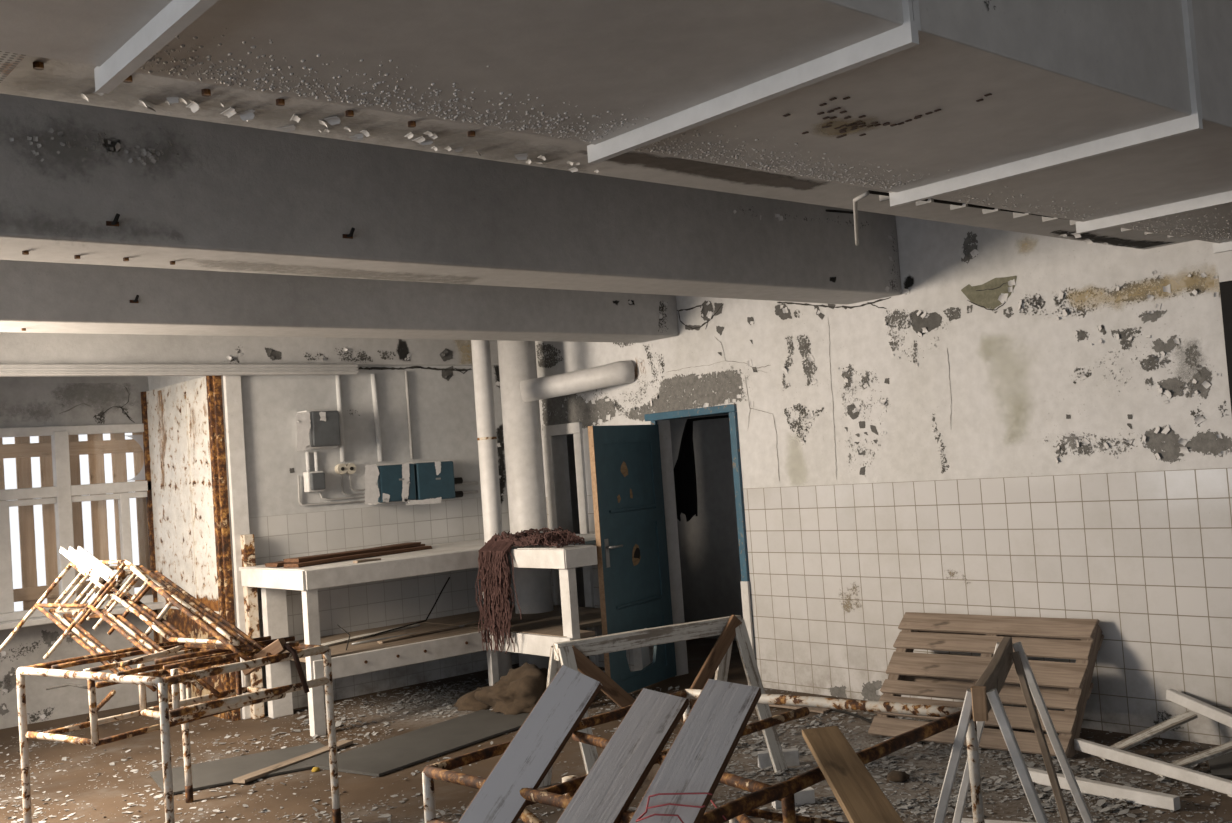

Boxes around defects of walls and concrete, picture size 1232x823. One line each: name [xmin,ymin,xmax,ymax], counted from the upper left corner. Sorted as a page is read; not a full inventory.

peeling [138,97,202,113]
peeling [318,116,370,141]
peeling [404,131,481,156]
rust [802,97,941,138]
spalling [885,235,914,294]
peeling [960,232,979,263]
peeling [1051,230,1174,248]
peeling [775,303,800,320]
peeling [541,301,757,432]
peeling [782,335,817,391]
peeling [784,403,824,444]
peeling [837,364,890,477]